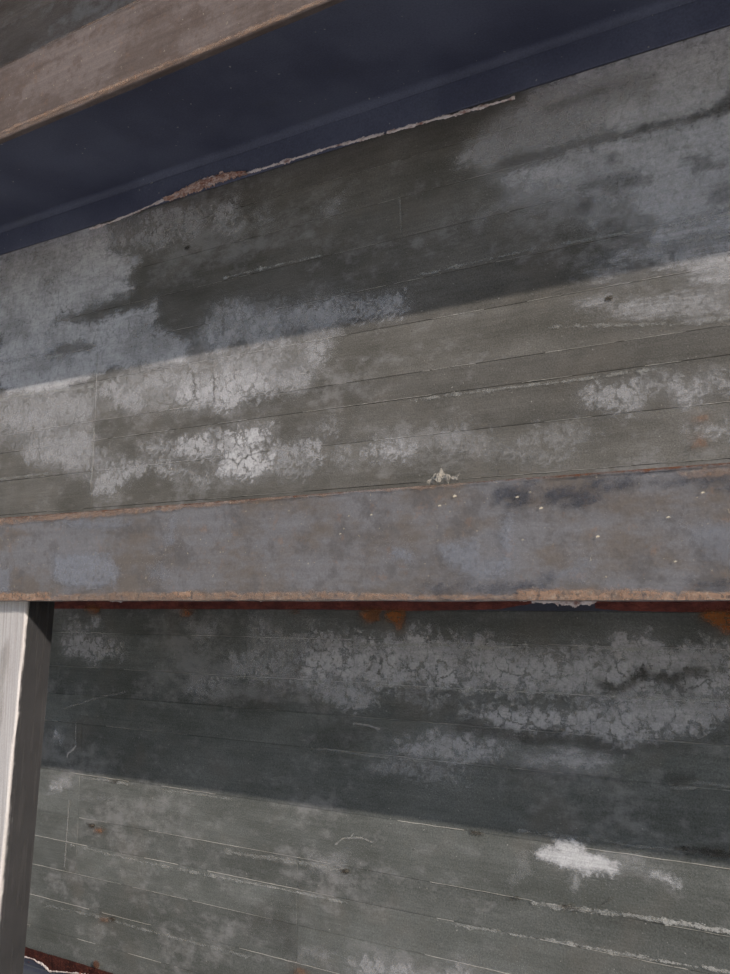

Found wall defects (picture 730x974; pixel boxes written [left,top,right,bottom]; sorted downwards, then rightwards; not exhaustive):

peeling [193,96,515,189]
leakage [461,26,730,282]
rust [163,171,247,201]
efflorescence [0,207,298,427]
efflorescence [207,298,341,353]
leakage [94,462,173,493]
efflorescence [176,422,323,483]
rust [0,588,730,634]
leakage [300,625,730,769]
efflorescence [536,839,619,876]
rust [24,947,113,974]